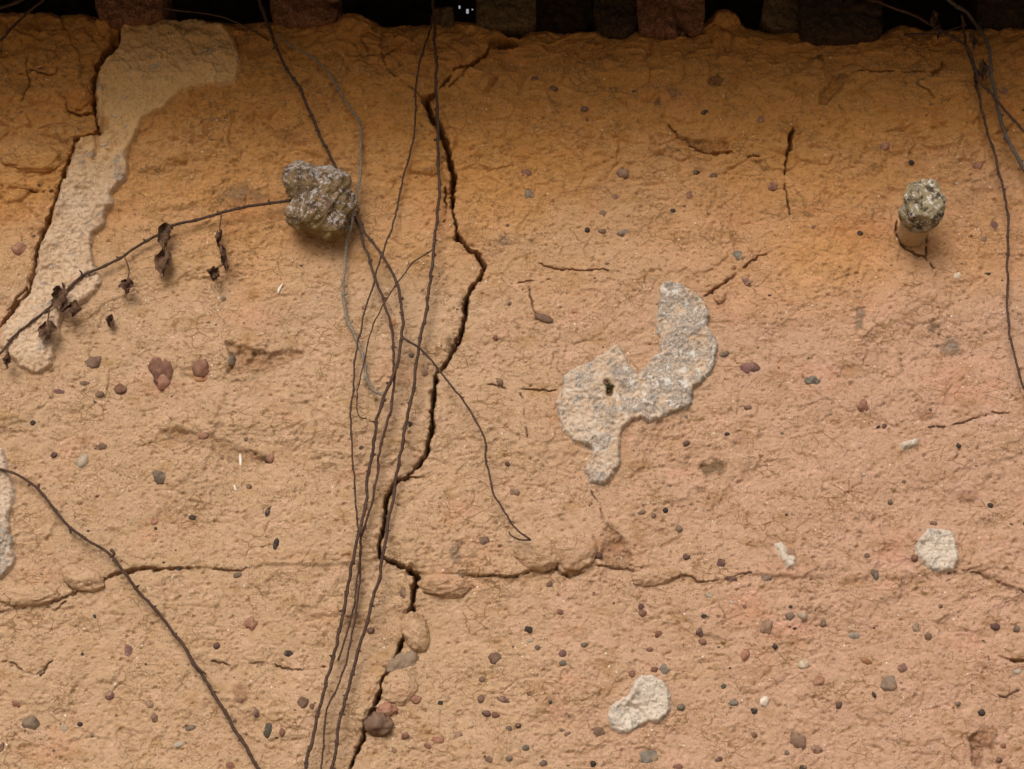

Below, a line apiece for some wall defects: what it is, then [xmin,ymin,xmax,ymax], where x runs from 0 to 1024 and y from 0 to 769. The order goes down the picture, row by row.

crack [0,28,121,328]
peeling [0,18,242,375]
crack [668,125,795,215]
crack [360,27,499,613]
crack [518,263,619,313]
crack [704,253,767,305]
peeling [554,281,719,486]
crack [103,564,258,580]
crack [461,491,643,579]
peeling [915,528,959,574]
crack [349,638,405,769]
peeling [607,675,671,734]